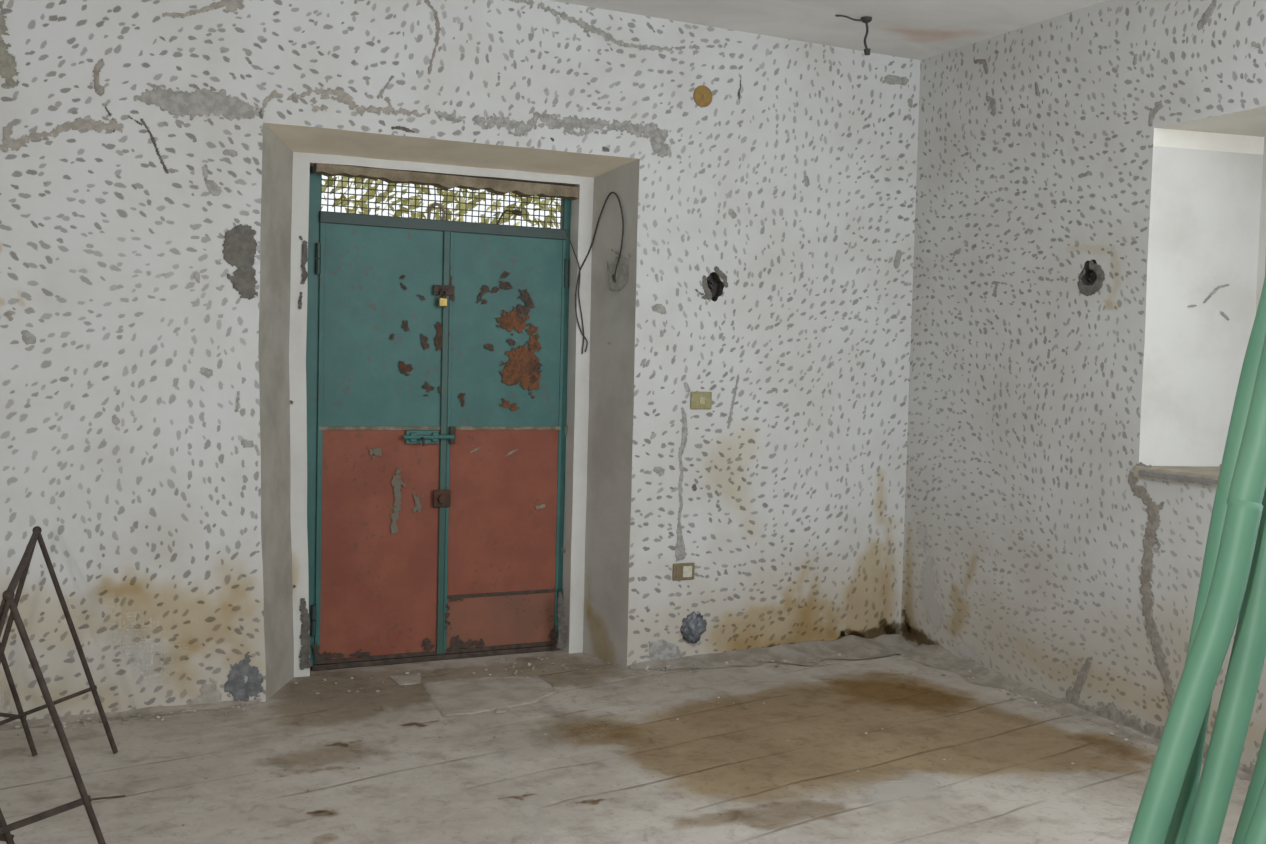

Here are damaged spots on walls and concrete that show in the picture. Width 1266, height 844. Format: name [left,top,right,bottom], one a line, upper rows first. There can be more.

peeling [227,257,259,300]
corrosion [389,320,450,351]
corrosion [476,271,543,412]
corrosion [398,361,414,376]
corrosion [423,381,465,407]
crack [1128,462,1174,710]
leakage [839,620,934,645]